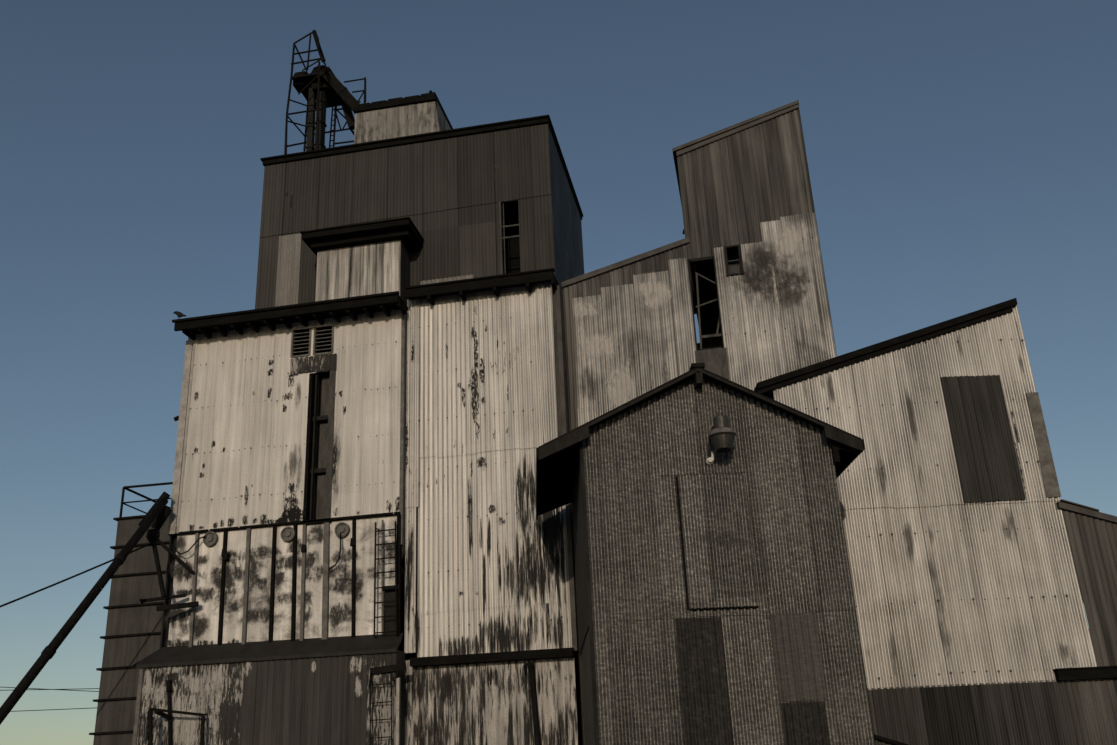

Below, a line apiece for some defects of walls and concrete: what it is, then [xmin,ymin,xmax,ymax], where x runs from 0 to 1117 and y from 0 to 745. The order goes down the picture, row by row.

rust [253,360,300,412]
rust [176,454,301,531]
rust [405,532,422,653]
rust [151,664,200,686]
rust [408,668,498,745]